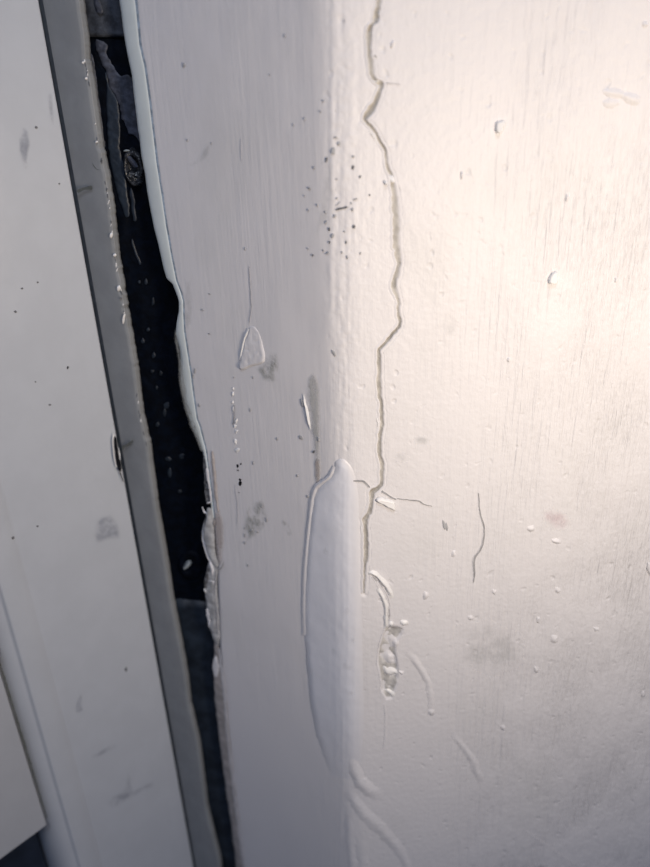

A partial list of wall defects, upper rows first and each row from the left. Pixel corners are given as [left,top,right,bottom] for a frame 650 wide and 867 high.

crack [353,0,432,594]
crack [472,493,485,583]
spalling [368,570,408,700]